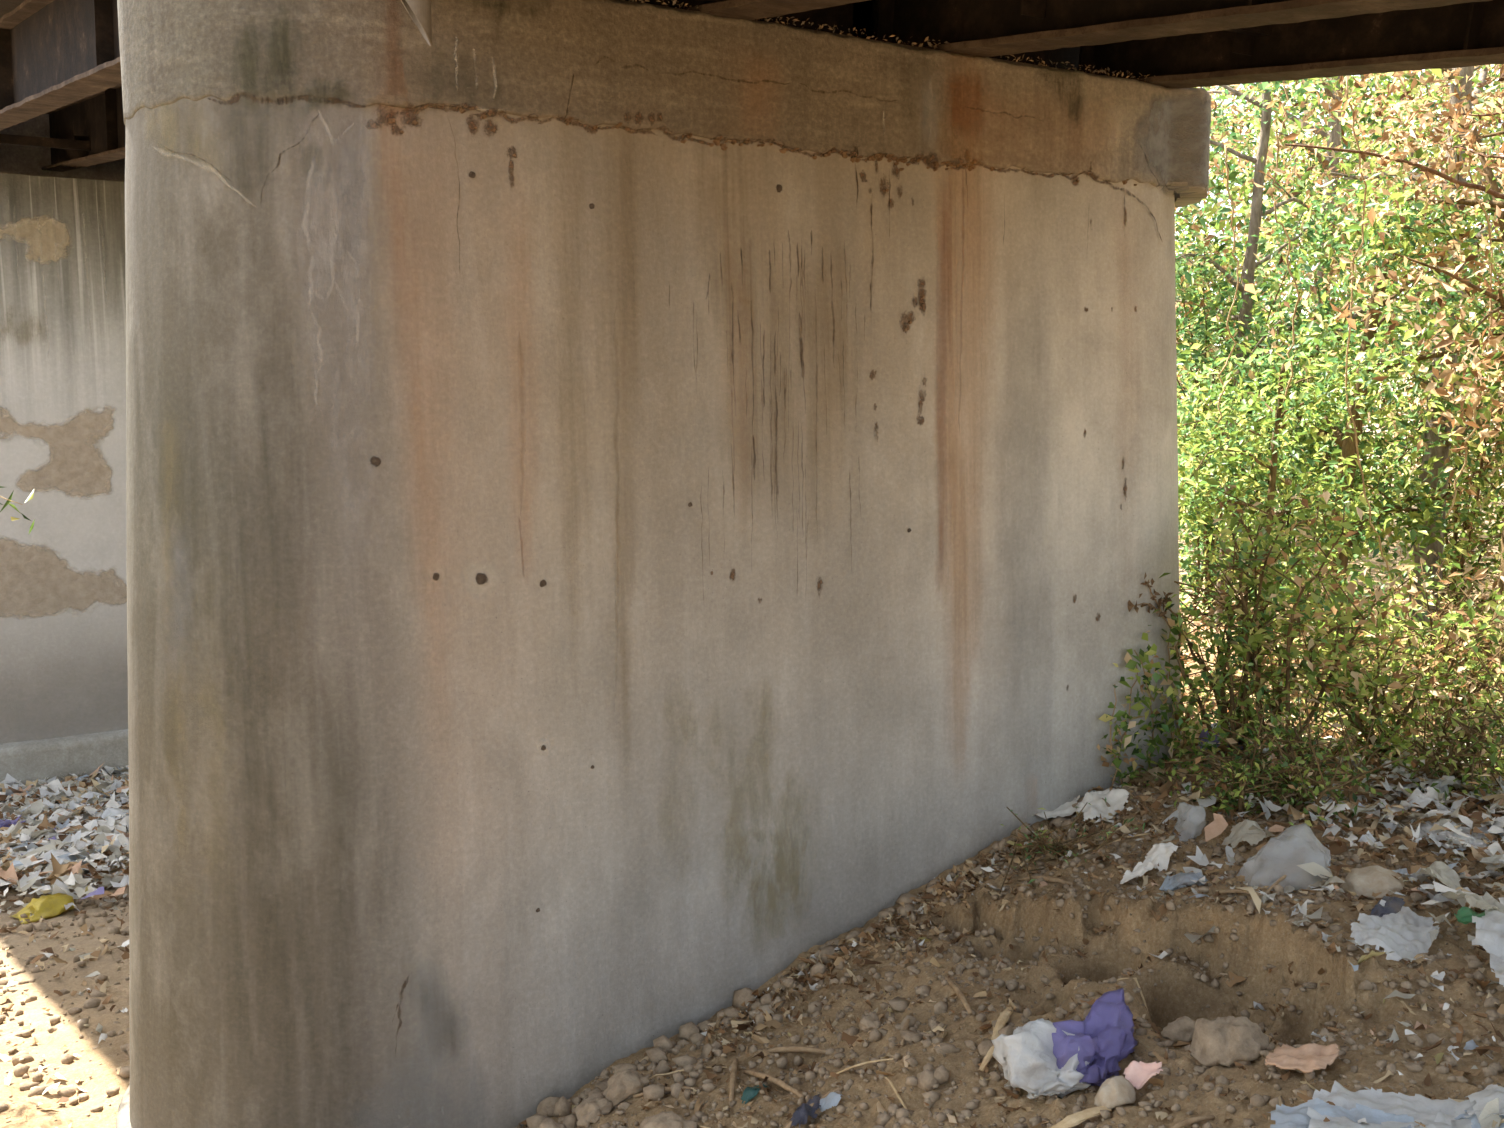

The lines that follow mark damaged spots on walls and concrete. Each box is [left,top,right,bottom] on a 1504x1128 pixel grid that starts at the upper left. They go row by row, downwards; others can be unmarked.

crack [208,93,364,204]
crack [409,61,1162,240]
peeling [0,217,69,262]
water stain [732,303,817,493]
peeling [0,407,113,496]
peeling [0,538,127,617]
crack [397,978,408,1032]